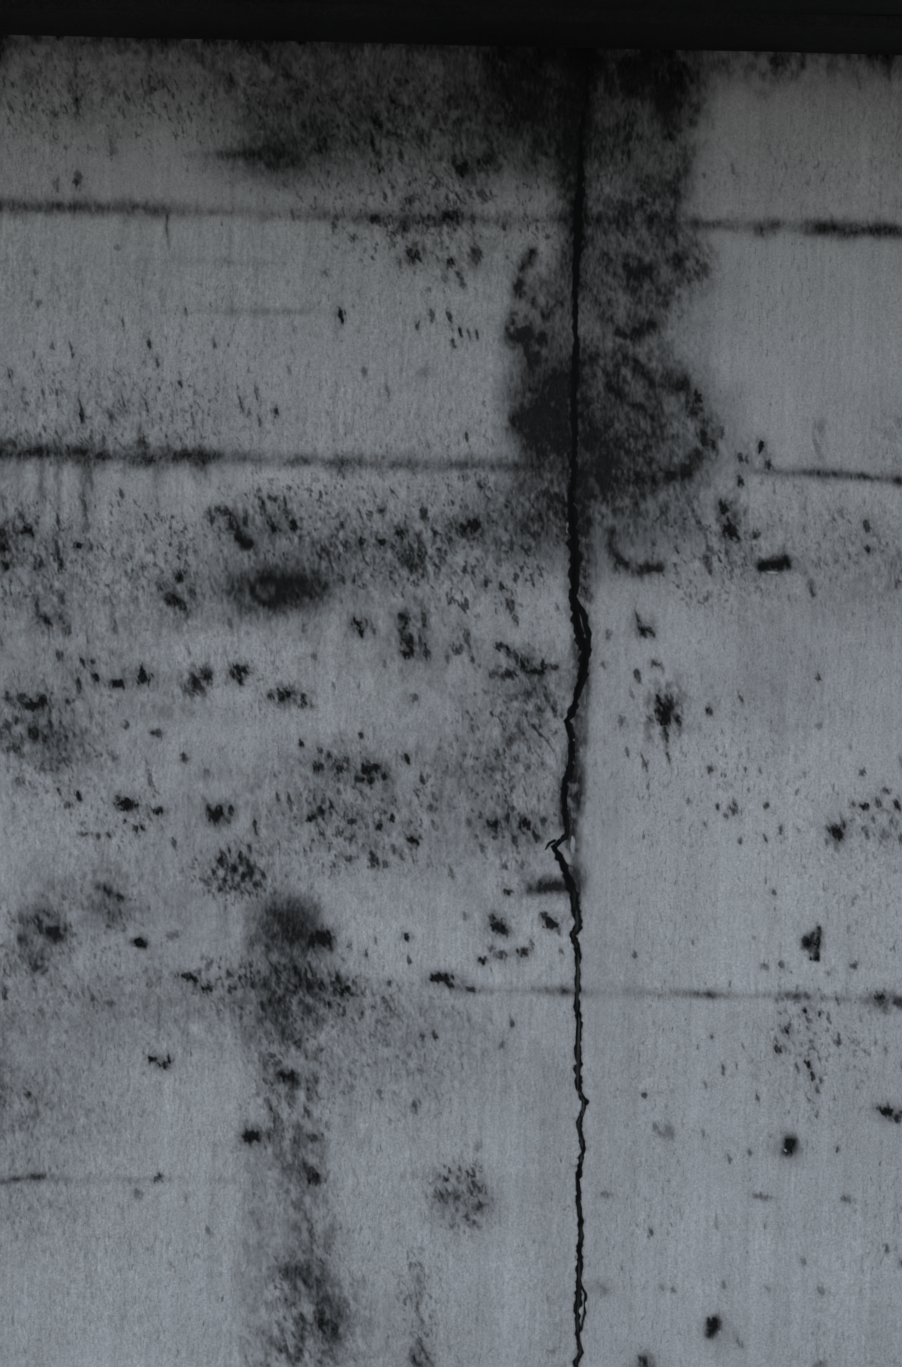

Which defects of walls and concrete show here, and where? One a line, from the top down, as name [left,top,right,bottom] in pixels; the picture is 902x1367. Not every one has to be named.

leakage [0,428,253,467]
leakage [370,46,723,896]
leakage [207,487,298,550]
leakage [222,522,377,616]
leakage [4,658,153,753]
crack [535,48,592,1367]
leakage [299,739,387,788]
leakage [114,795,163,833]
leakage [276,792,419,867]
leakage [478,915,534,965]
leakage [540,912,563,953]
leakage [175,899,363,1103]